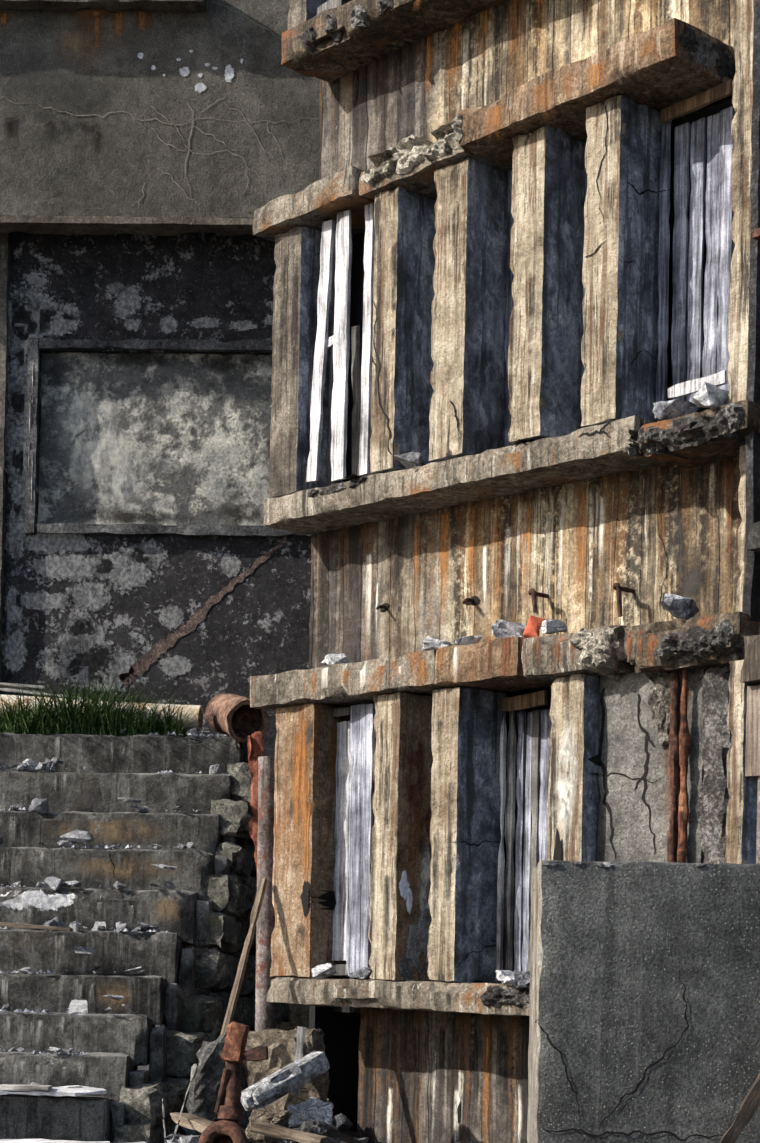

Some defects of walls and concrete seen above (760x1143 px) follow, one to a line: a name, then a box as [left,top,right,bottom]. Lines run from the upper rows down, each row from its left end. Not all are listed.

peeling [177,50,243,93]
crack [1,92,320,209]
spalling [361,115,463,186]
spalling [622,402,746,460]
damp [112,512,171,522]
damp [225,506,260,519]
spalling [570,618,745,749]
crack [588,688,663,859]
corrosion [667,669,690,863]
crack [536,973,747,1141]